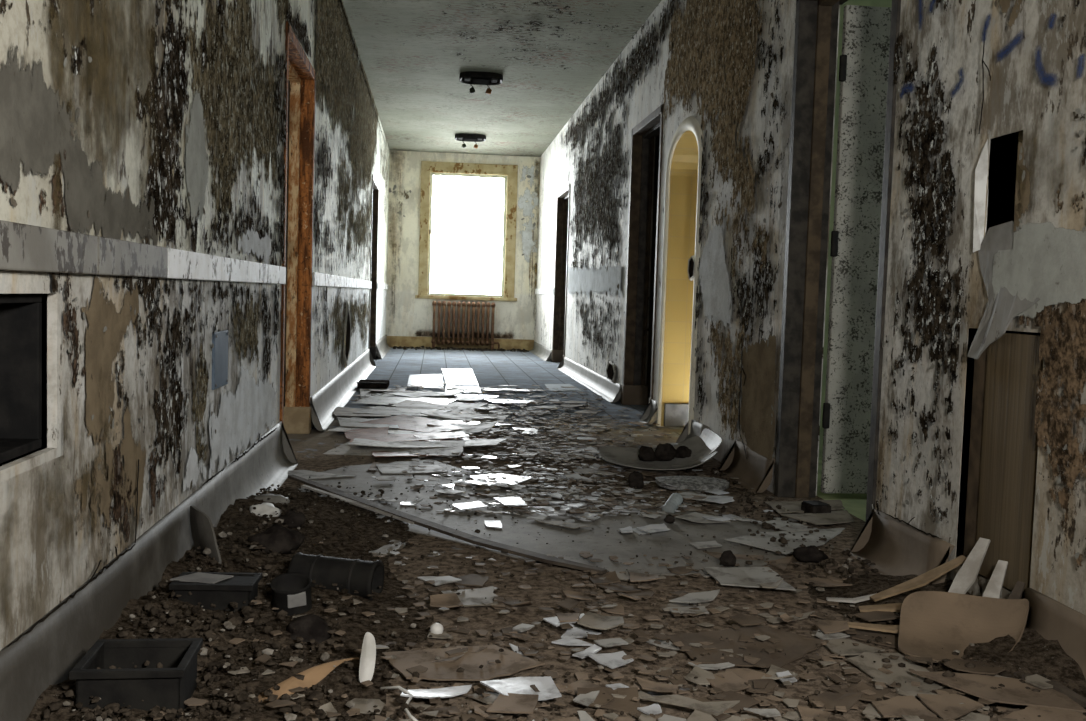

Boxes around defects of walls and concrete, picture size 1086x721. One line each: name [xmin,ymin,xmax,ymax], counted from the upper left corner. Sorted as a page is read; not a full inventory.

water stain [51,0,154,172]
flaking render [0,0,411,376]
peeling [1073,108,1086,170]
flaking render [47,272,280,564]
peeling [992,141,1086,532]